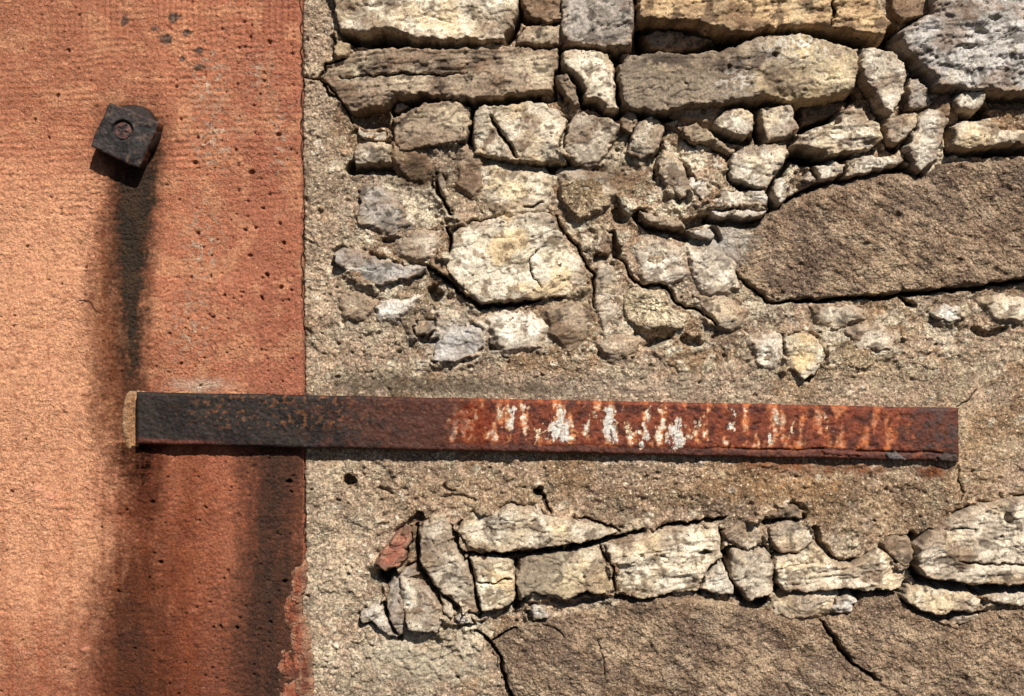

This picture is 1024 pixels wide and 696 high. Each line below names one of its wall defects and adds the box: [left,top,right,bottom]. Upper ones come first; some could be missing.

corrosion [92,144,184,696]
corrosion [821,447,906,472]
corrosion [920,452,957,477]
damp [230,447,303,696]
spalling [277,560,315,696]
crack [477,626,516,696]
crack [821,620,877,679]